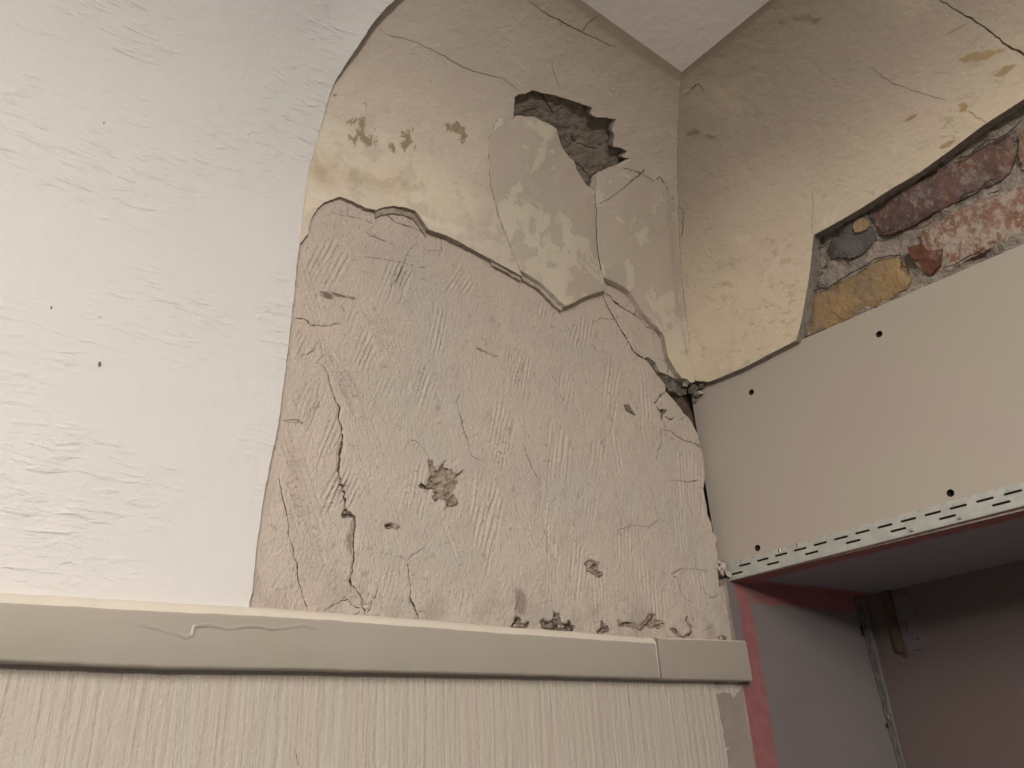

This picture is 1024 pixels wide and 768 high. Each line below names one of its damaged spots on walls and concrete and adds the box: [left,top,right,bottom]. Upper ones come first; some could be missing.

damp [346,117,377,147]
damp [389,127,416,152]
damp [446,121,467,144]
spalling [514,90,624,187]
crack [332,207,443,290]
flaking render [805,107,1024,337]
crack [595,168,699,461]
crack [279,315,378,615]
spalling [418,459,463,509]
crack [401,548,422,619]
spalling [510,597,575,631]
spalling [590,613,693,638]